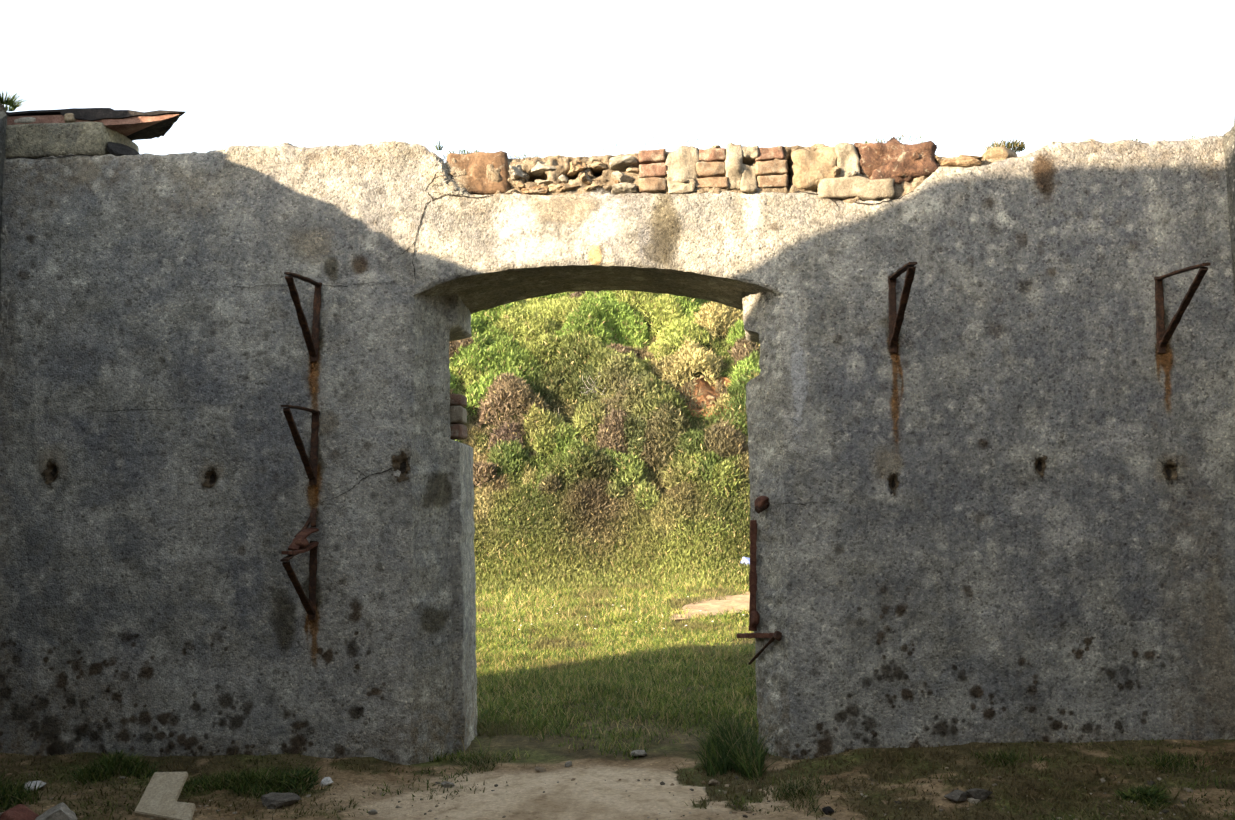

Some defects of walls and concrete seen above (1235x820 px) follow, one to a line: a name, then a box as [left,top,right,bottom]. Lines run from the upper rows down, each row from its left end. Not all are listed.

water stain [1030,155,1056,196]
crack [324,175,493,298]
crack [321,468,392,509]